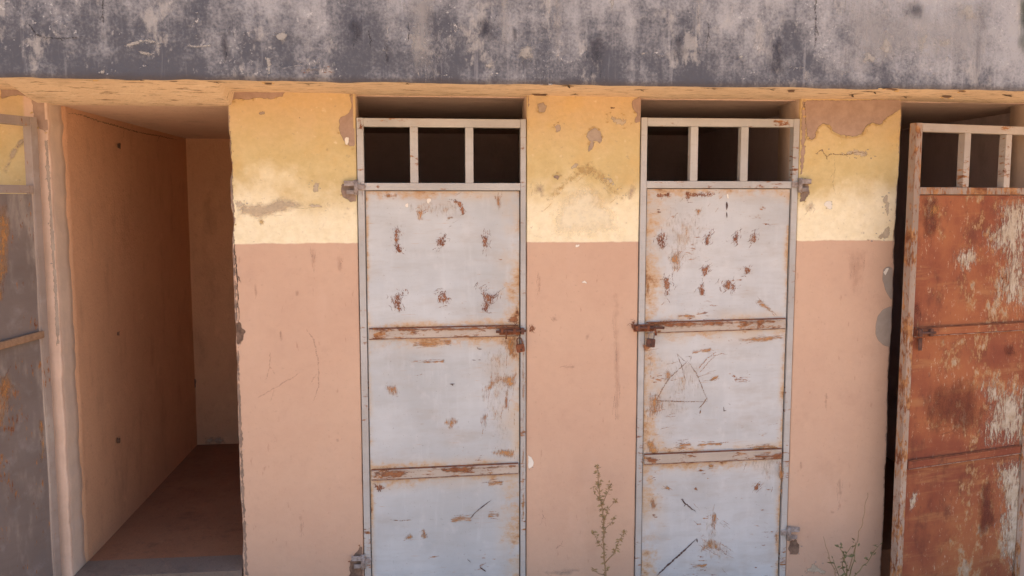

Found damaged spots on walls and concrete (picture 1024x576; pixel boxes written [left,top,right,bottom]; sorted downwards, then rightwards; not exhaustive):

peeling [338,94,356,150]
spalling [585,97,641,152]
spalling [800,88,901,174]
rust [475,283,505,313]
rust [647,233,683,295]
rust [649,300,782,343]
rust [699,259,752,296]
rust [373,311,535,434]
rust [374,469,412,492]
rust [436,447,524,485]
rust [747,444,784,493]
rust [981,482,994,532]